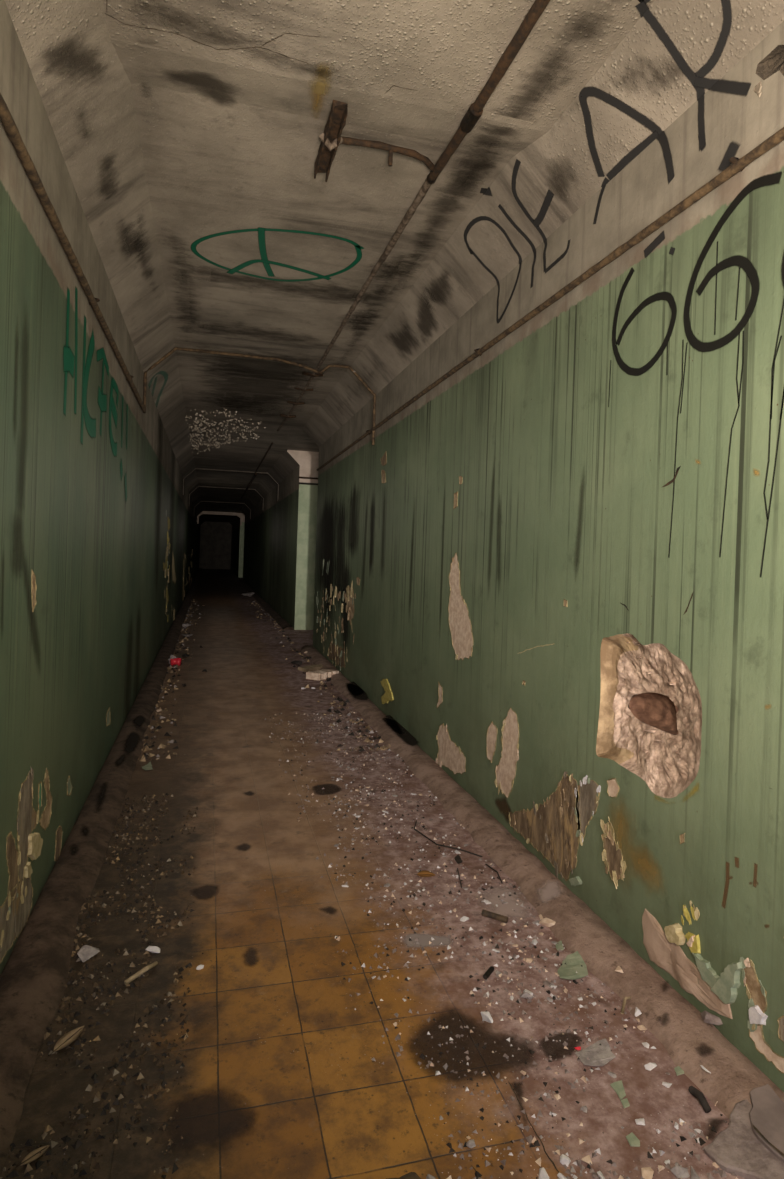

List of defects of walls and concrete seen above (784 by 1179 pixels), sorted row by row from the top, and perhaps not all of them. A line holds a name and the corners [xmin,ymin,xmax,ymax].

spalling [754,45,784,97]
peeling [316,559,360,670]
peeling [448,553,473,660]
peeling [436,723,466,775]
spalling [486,633,702,889]
peeling [0,767,63,964]
flaking render [642,900,784,1074]